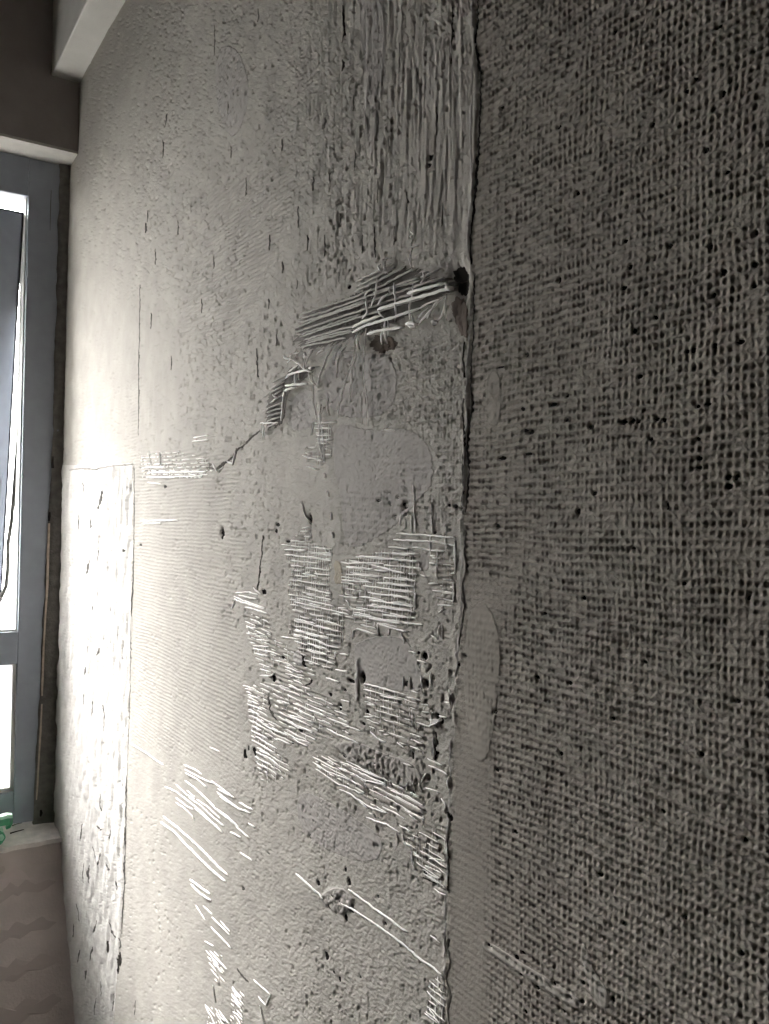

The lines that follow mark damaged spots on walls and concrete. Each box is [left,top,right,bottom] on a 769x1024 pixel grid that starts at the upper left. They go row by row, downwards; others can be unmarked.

flaking render [453,267,470,296]
crack [450,0,483,644]
crack [206,430,260,470]
flaking render [329,636,429,725]
peeling [336,741,422,794]
peeling [317,867,354,922]